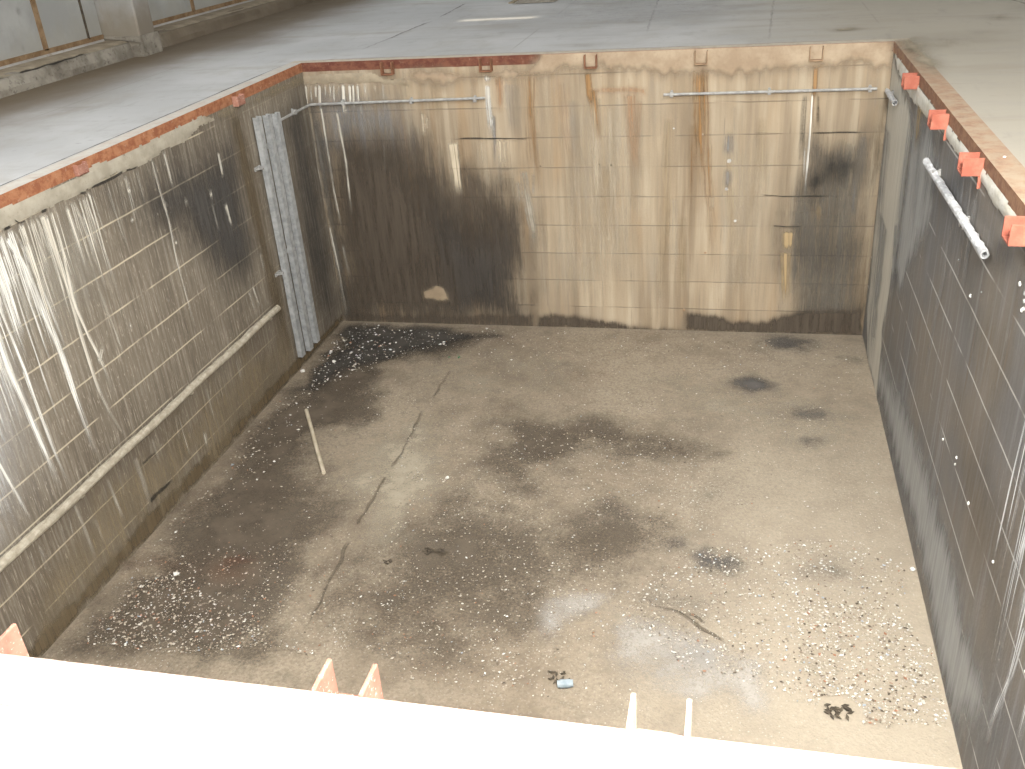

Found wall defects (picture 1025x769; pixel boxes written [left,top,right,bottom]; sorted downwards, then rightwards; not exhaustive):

efflorescence [0,195,108,465]
leakage [28,73,691,661]
leakage [687,58,939,415]
crack [310,417,420,620]
efflorescence [993,423,1025,716]